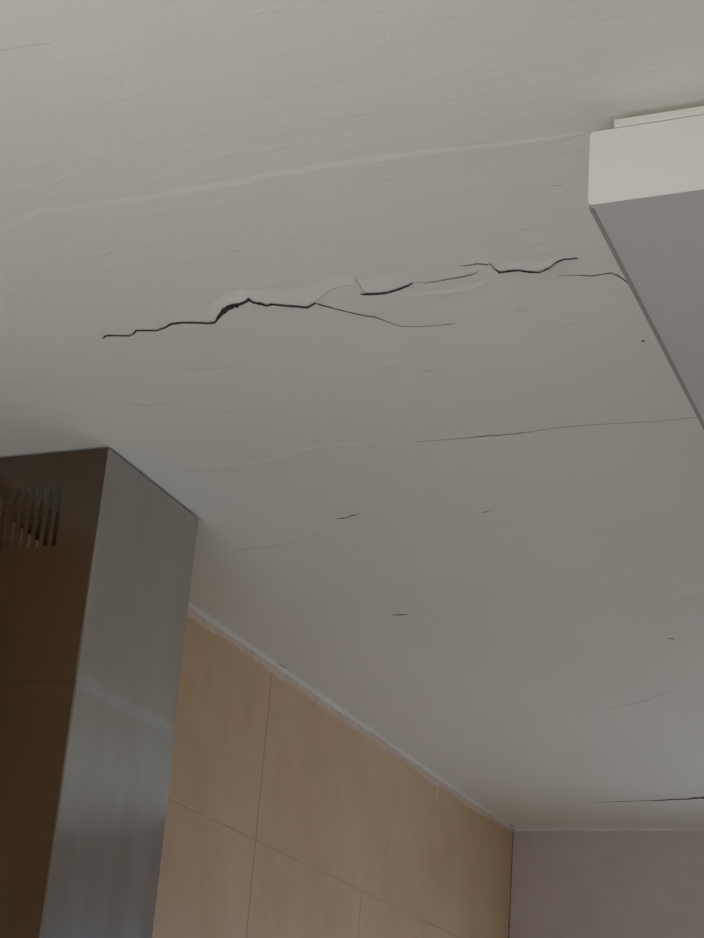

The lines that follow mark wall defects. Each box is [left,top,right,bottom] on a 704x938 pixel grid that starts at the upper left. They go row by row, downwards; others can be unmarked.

crack [415,417,697,442]
crack [616,795,704,803]